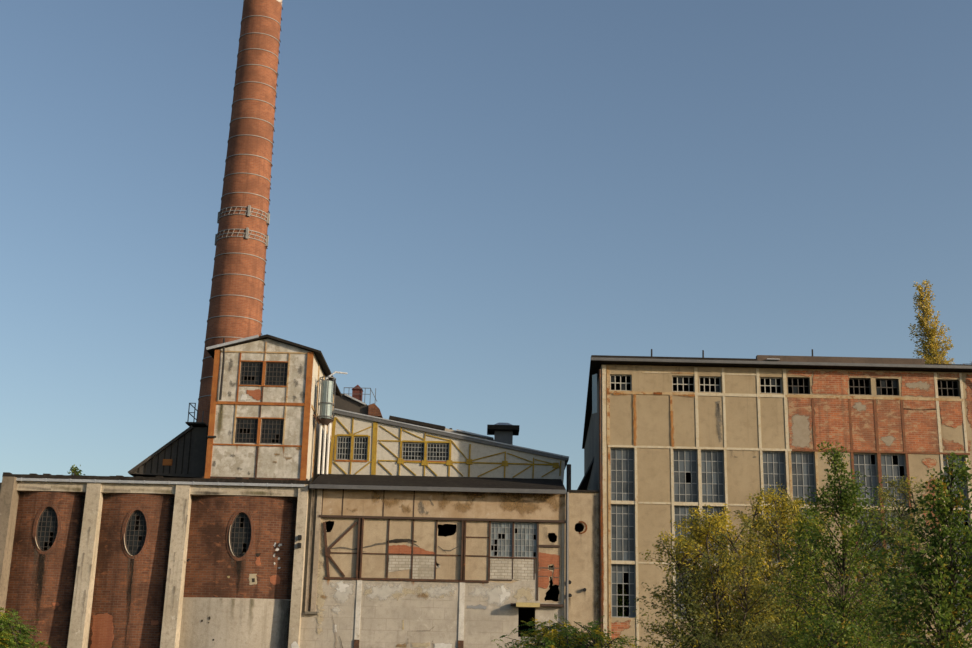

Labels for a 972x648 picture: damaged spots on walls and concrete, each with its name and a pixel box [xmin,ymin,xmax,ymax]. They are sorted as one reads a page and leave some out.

peeling [787,370,972,531]
peeling [308,533,456,634]
peeling [470,552,560,605]